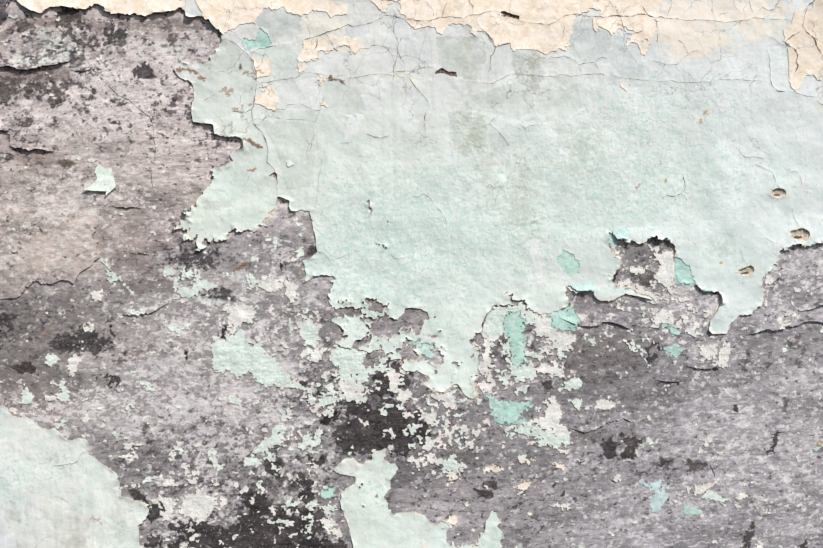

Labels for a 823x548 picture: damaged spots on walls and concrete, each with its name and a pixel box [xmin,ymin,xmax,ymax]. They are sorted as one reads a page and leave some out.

crack [227,39,327,204]
crack [298,0,698,126]
peeling [371,0,662,55]
crack [529,0,823,105]
peeling [783,0,823,91]
peeling [0,0,365,474]